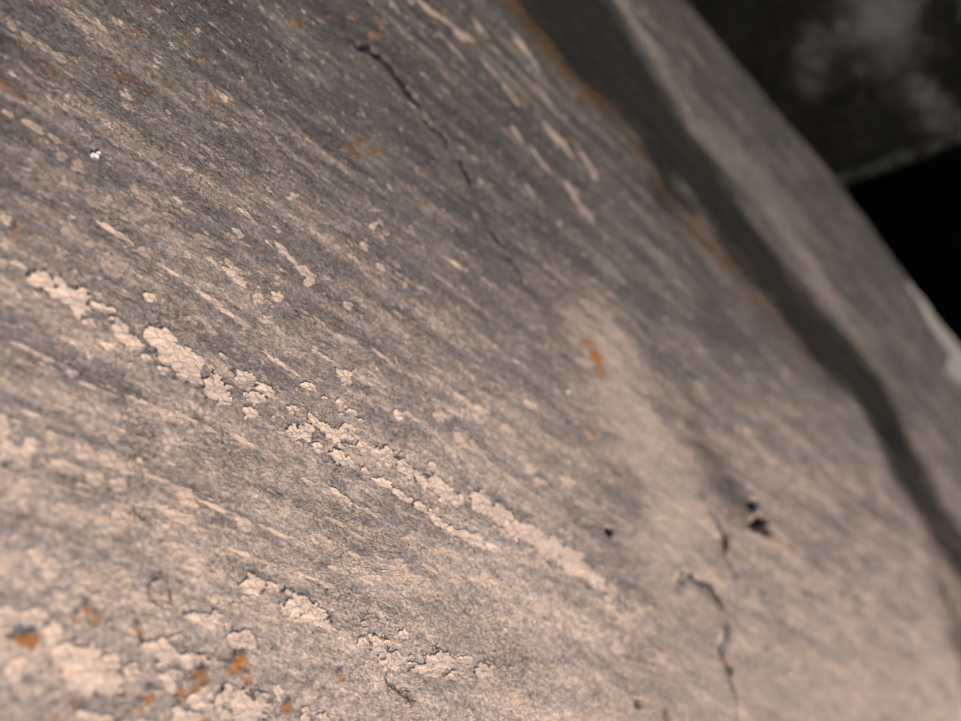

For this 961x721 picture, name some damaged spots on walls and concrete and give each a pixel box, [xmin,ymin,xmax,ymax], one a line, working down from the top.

crack [352,39,524,283]
peeling [90,221,284,328]
corrosion [581,339,606,379]
peeling [0,255,647,655]
crack [695,482,733,568]
corrosion [12,632,40,649]
peeling [0,605,152,721]
corrosion [177,669,209,700]
peeling [132,633,291,721]
corrosion [226,654,253,684]
peeling [356,621,534,715]
crack [676,570,739,719]